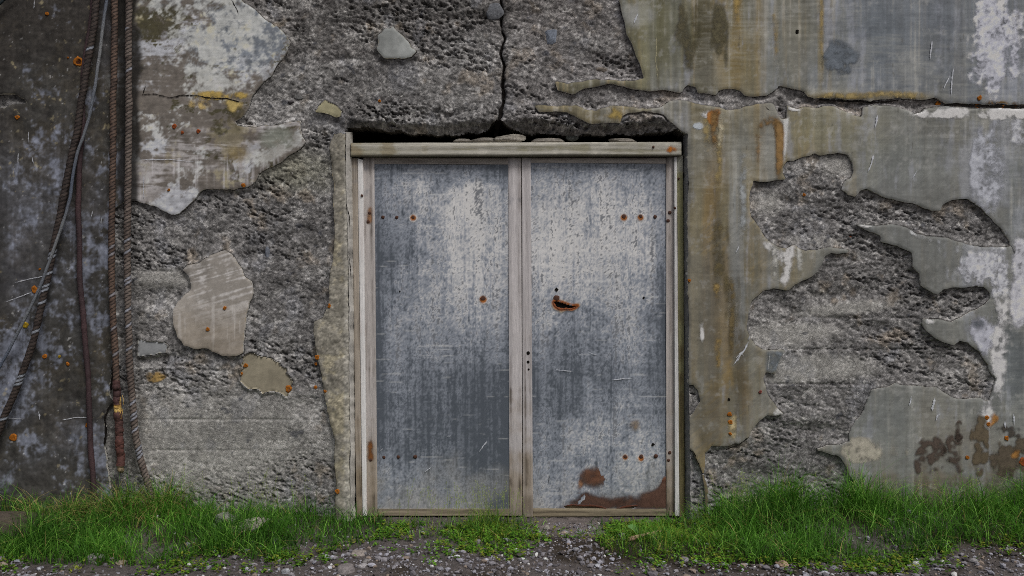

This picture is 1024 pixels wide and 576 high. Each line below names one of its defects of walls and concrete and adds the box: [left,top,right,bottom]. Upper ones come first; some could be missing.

damp [711,0,740,61]
crack [142,86,239,102]
crack [494,0,506,137]
crack [819,97,898,105]
efflorescence [915,0,1024,214]
crack [947,101,1024,109]
corrosion [704,110,722,180]
corrosion [760,117,784,174]
spalling [131,0,1024,519]
spalling [105,204,149,507]
damp [914,238,1024,480]
corrosion [571,468,666,509]